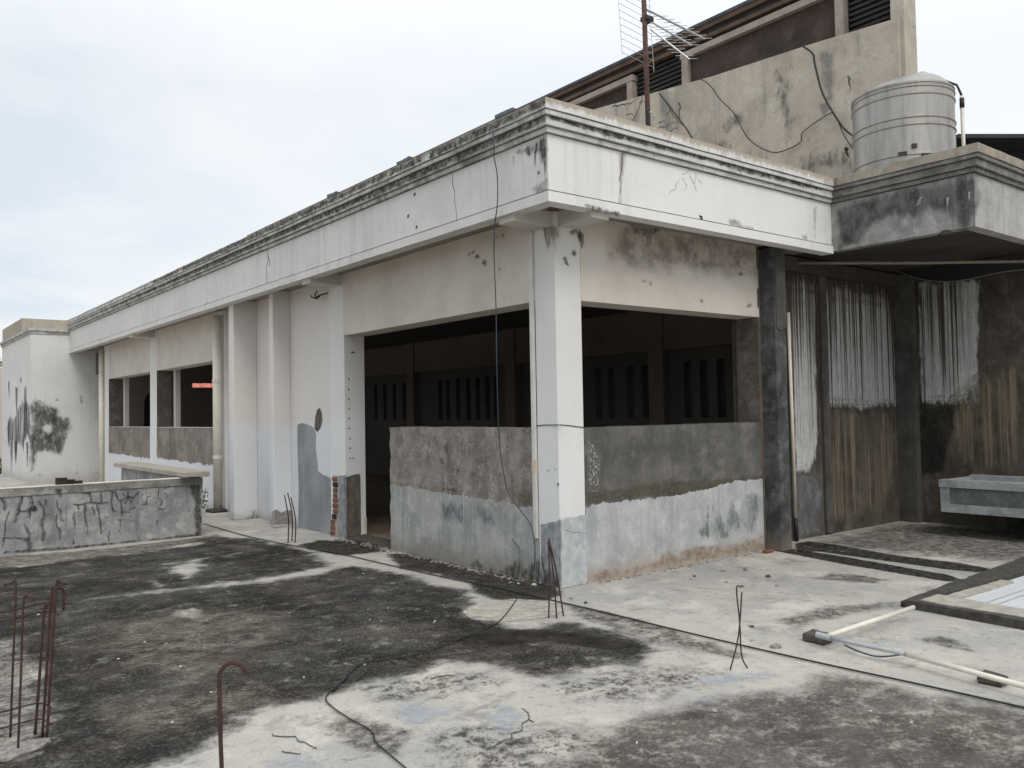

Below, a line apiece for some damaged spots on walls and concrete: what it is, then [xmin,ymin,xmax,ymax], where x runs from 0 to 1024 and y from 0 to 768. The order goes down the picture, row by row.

damp [113,98,817,308]
damp [838,180,979,244]
damp [8,378,69,471]
damp [787,273,898,517]
crack [1,488,162,552]
peeling [330,474,361,538]